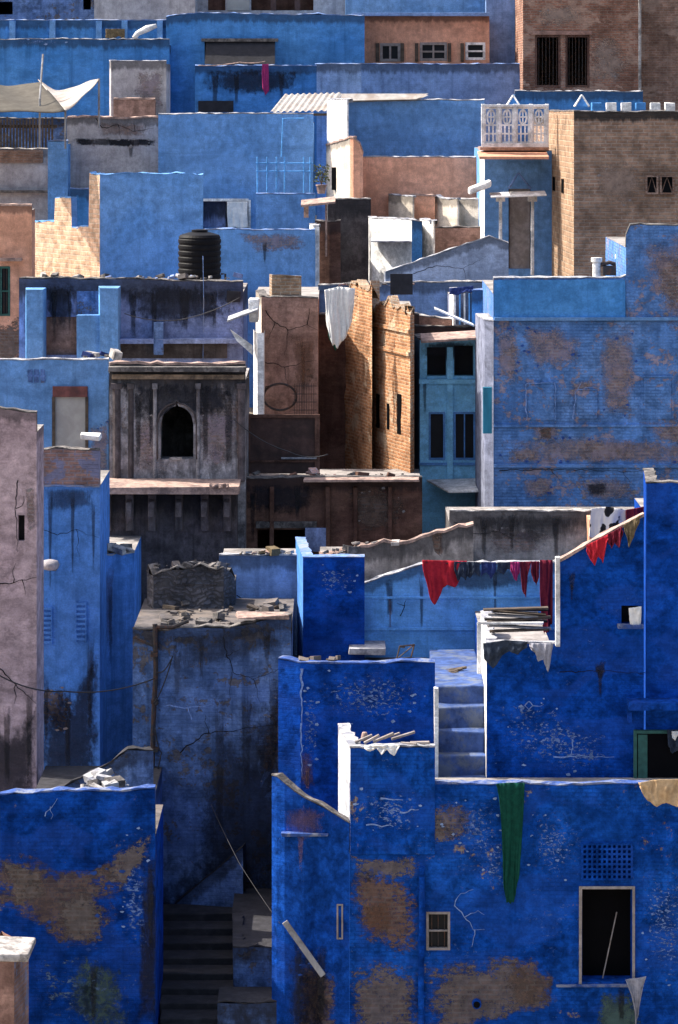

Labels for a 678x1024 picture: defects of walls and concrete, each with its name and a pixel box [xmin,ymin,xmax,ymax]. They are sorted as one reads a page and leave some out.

water stain [210,70,296,94]
crack [265,309,317,384]
spalling [497,326,580,377]
spalling [600,333,637,417]
spalling [499,422,678,465]
spalling [578,477,636,499]
crack [0,480,37,589]
crack [166,636,304,772]
spalling [435,797,502,882]
peeling [0,827,150,951]
flaking render [350,856,558,1024]
crack [454,890,485,945]